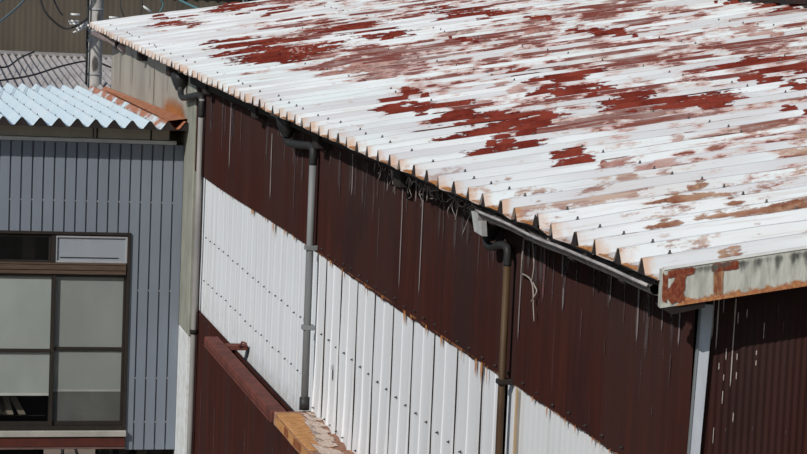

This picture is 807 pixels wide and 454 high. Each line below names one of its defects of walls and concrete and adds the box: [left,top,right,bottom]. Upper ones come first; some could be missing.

rust [199,4,551,79]
rust [147,101,189,138]
rust [403,169,478,202]
rust [622,245,807,306]
rust [275,413,333,454]
peeling [302,411,344,454]